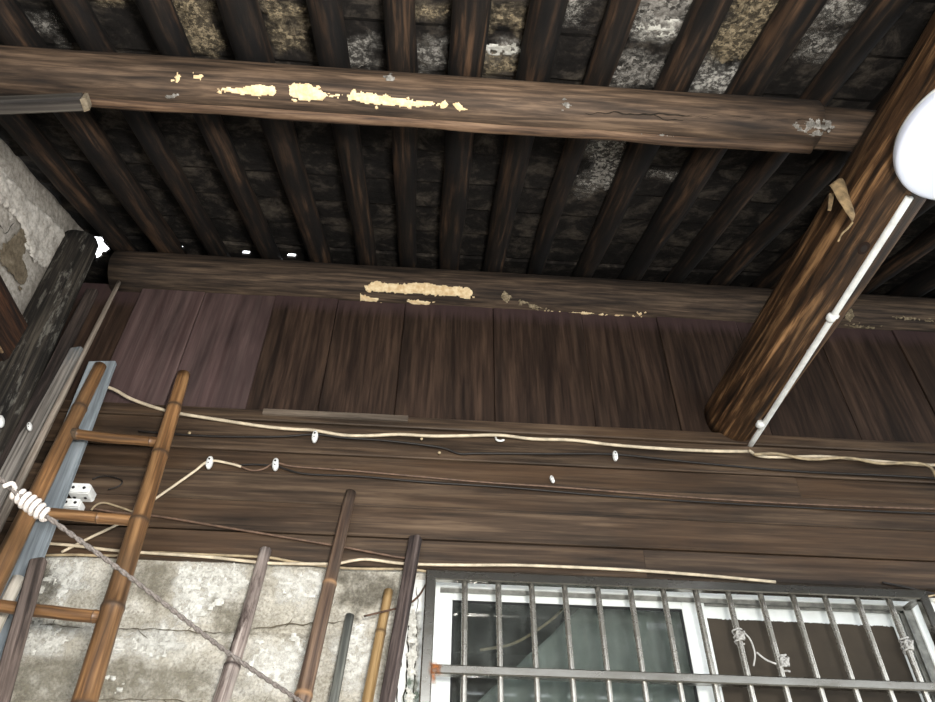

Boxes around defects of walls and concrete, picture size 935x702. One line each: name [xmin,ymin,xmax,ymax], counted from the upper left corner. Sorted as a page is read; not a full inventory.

peeling [217,84,276,99]
peeling [289,83,468,112]
peeling [792,118,835,136]
flaking render [0,166,65,290]
peeling [360,281,475,305]
peeling [501,291,646,317]
peeling [845,309,882,329]
crack [396,589,419,702]